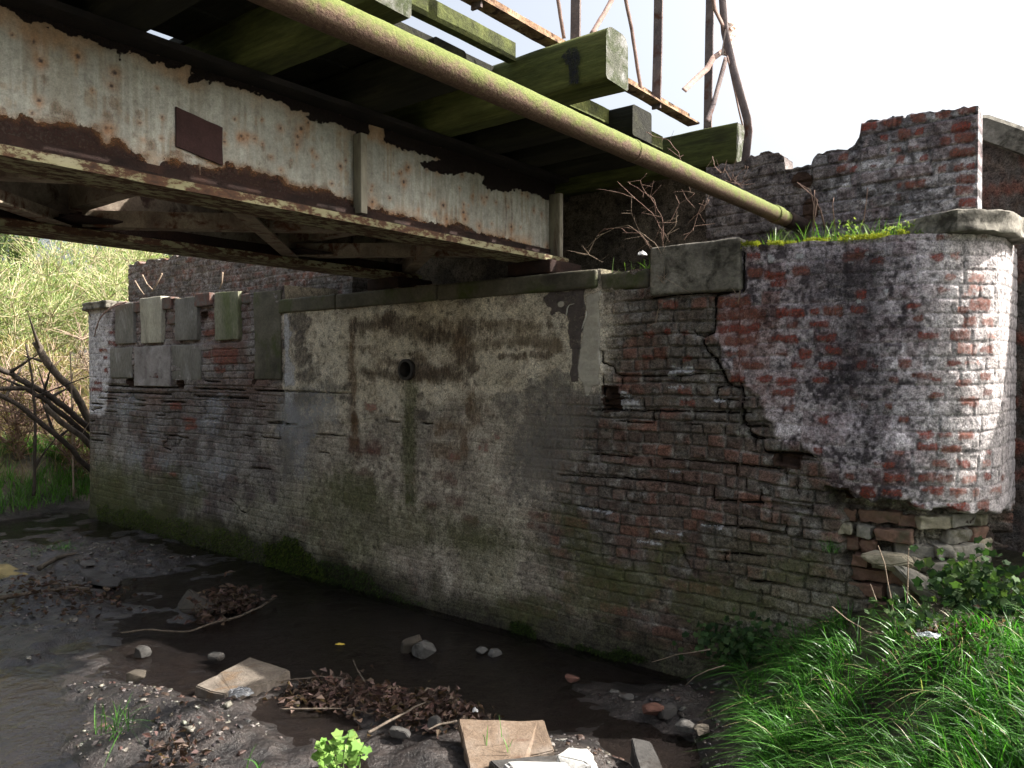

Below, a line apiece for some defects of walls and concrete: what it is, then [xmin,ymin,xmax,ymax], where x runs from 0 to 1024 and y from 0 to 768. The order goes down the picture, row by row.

peeling [0,3,370,135]
peeling [0,113,147,163]
peeling [160,158,354,208]
peeling [367,206,512,241]
peeling [384,129,555,200]
peeling [544,289,587,382]
peeling [717,290,867,411]
peeling [889,273,996,407]
spalling [601,385,623,413]
crack [564,252,816,602]
spalling [772,448,822,469]
spalling [837,430,1004,609]